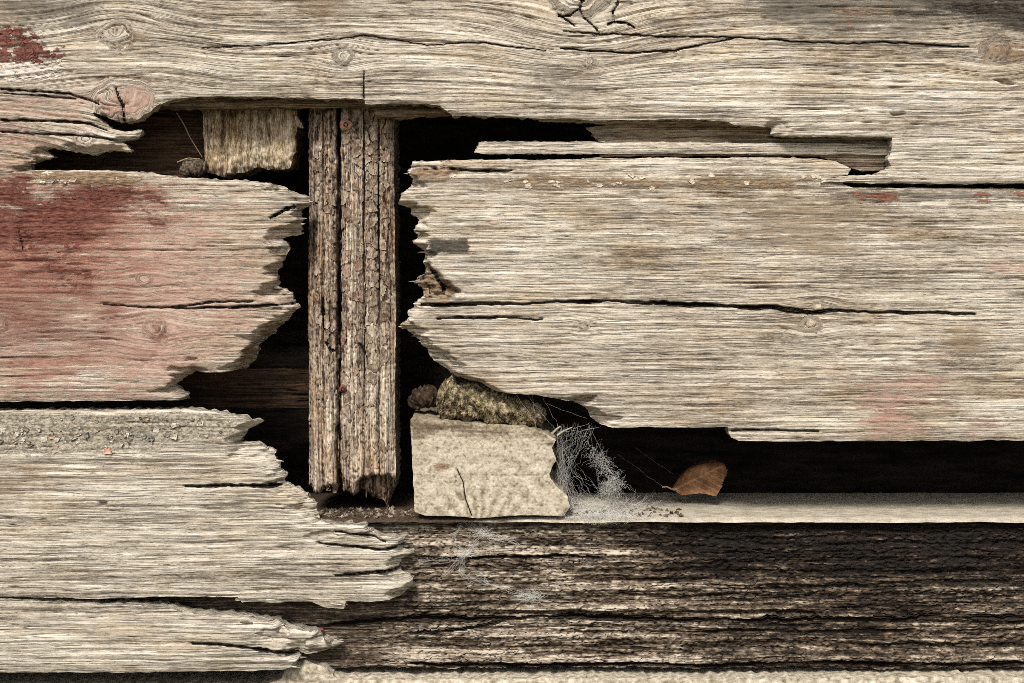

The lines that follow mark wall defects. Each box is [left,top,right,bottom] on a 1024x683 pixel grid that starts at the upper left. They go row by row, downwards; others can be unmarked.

peeling [0,20,68,81]
crack [201,0,969,53]
crack [0,88,125,141]
peeling [0,171,174,295]
crack [103,301,294,309]
crack [420,264,976,320]
crack [184,481,282,489]